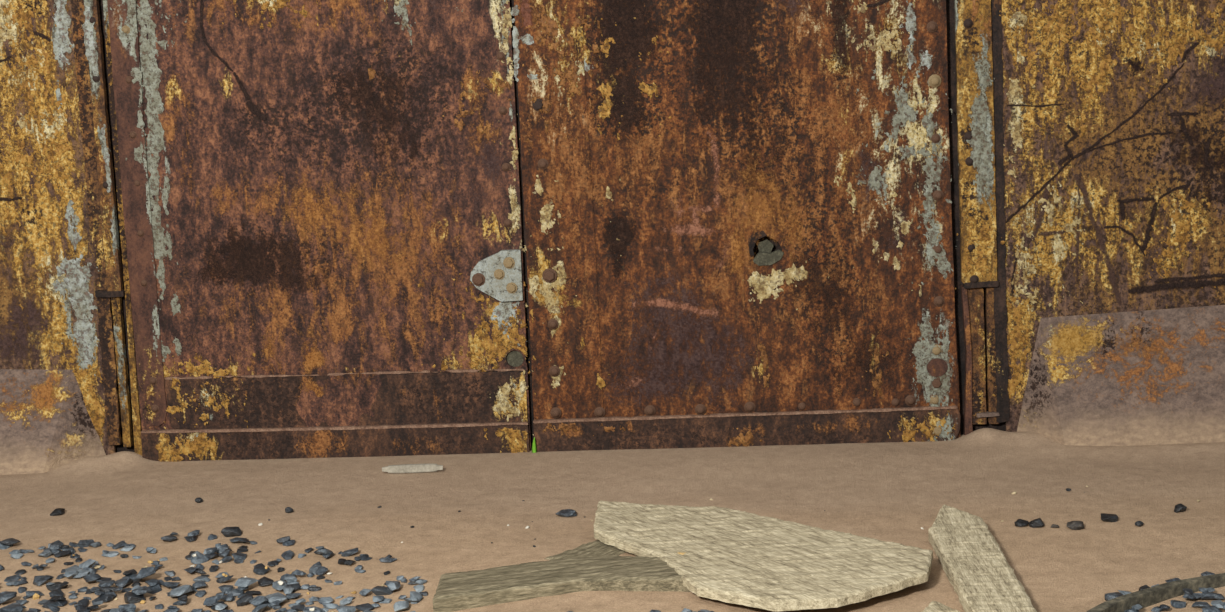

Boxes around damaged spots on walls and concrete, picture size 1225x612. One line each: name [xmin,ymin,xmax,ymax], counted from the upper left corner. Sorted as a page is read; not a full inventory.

crack [33,31,51,42]
rust [592,0,666,141]
rust [832,0,849,72]
peeling [101,124,111,193]
peeling [110,0,187,316]
crack [1167,111,1214,176]
crack [0,195,22,203]
rust [199,184,406,293]
peeling [834,0,1225,405]
peeling [747,258,811,304]
rust [723,163,898,392]
rust [303,331,324,397]